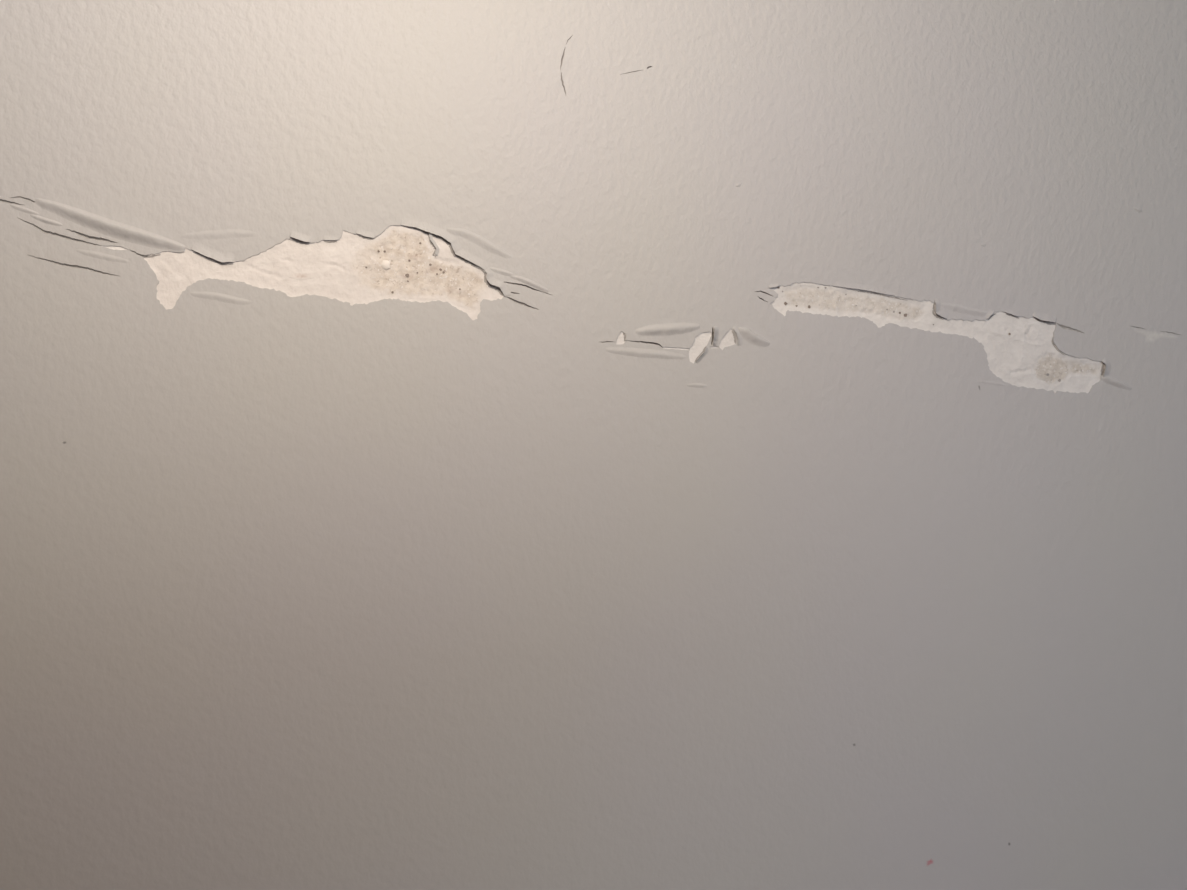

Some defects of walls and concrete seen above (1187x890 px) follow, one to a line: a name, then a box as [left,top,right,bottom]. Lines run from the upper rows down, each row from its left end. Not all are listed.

crack [0,196,148,276]
peeling [143,218,511,320]
peeling [602,325,744,364]
peeling [768,281,1111,393]